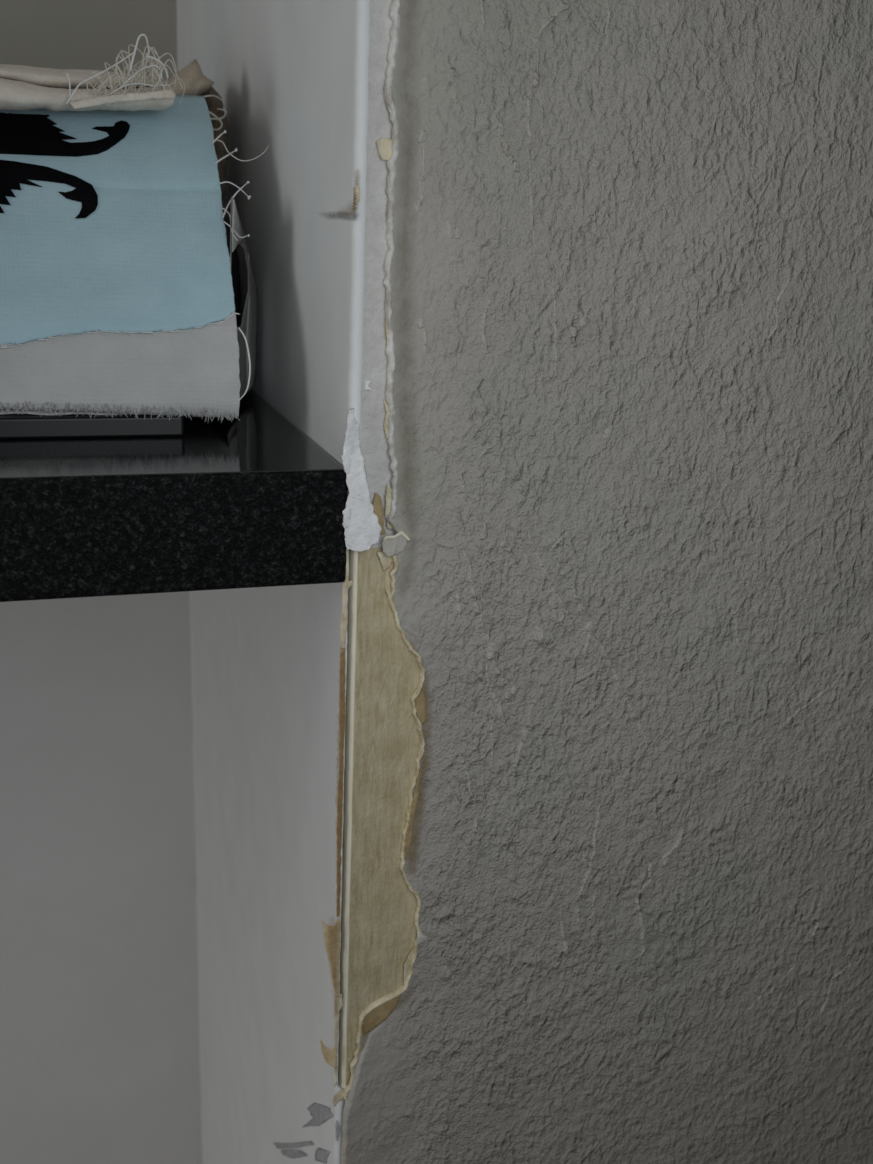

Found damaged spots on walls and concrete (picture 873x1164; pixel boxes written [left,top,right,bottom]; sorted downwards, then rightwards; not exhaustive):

peeling [320,0,428,1107]